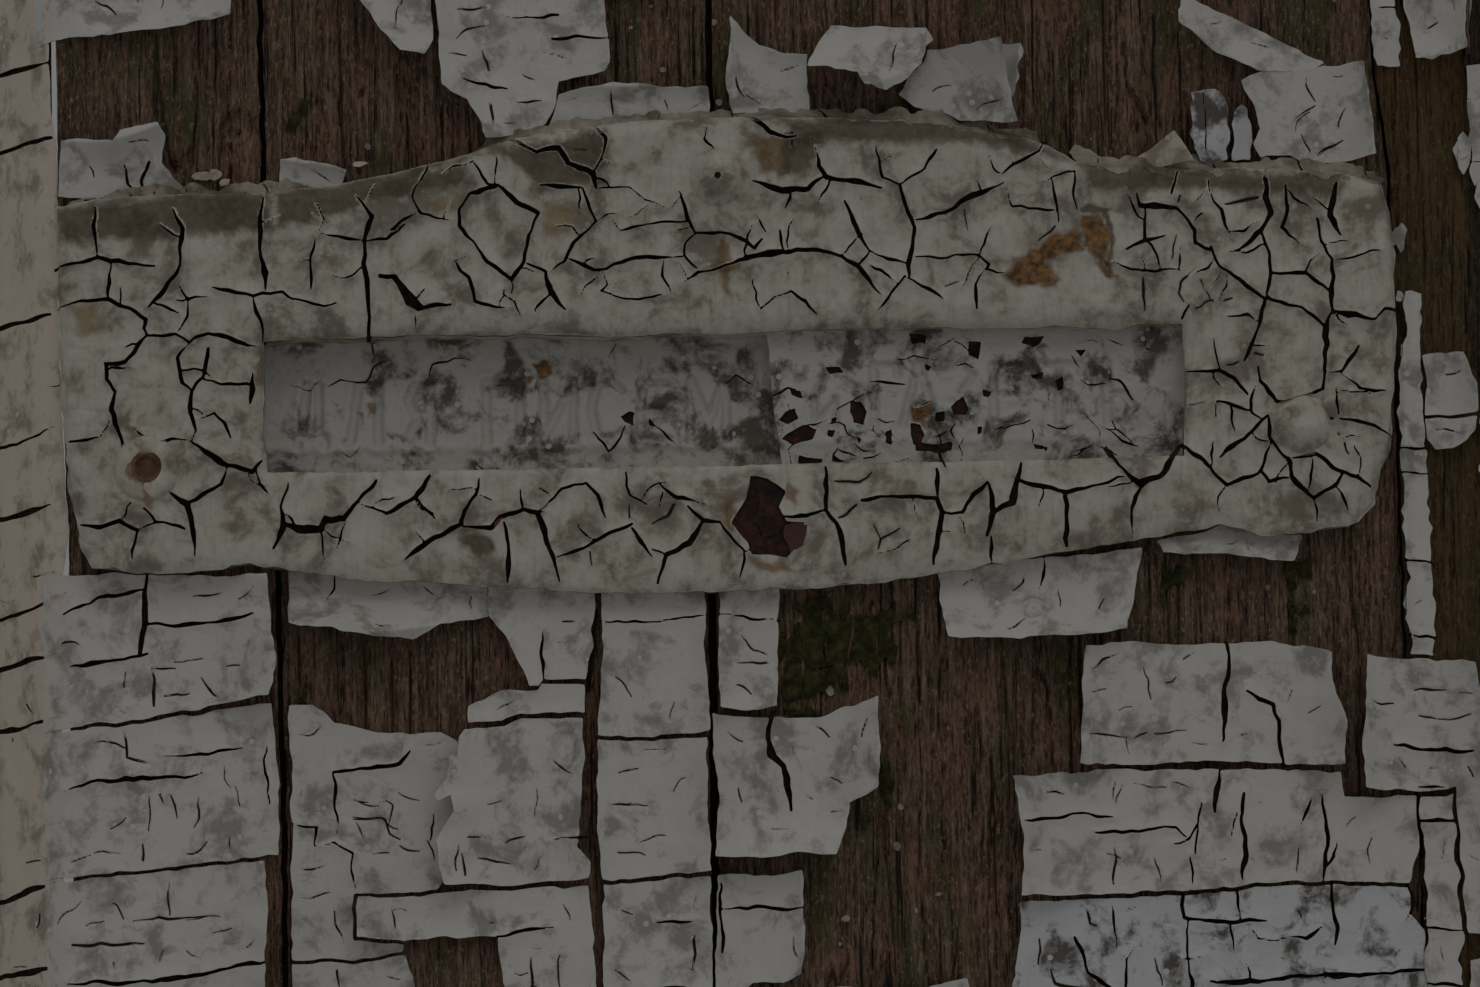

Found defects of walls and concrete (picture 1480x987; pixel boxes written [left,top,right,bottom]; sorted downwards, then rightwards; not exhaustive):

crack [95,0,164,15]
peeling [34,0,231,48]
peeling [360,0,1024,138]
peeling [1138,0,1480,167]
peeling [58,122,183,199]
rust [1005,213,1112,286]
crack [786,75,1458,629]
crack [0,7,1077,987]
crack [1408,600,1436,640]
peeling [41,571,881,987]
crack [1025,641,1477,987]
peeling [930,978,969,987]